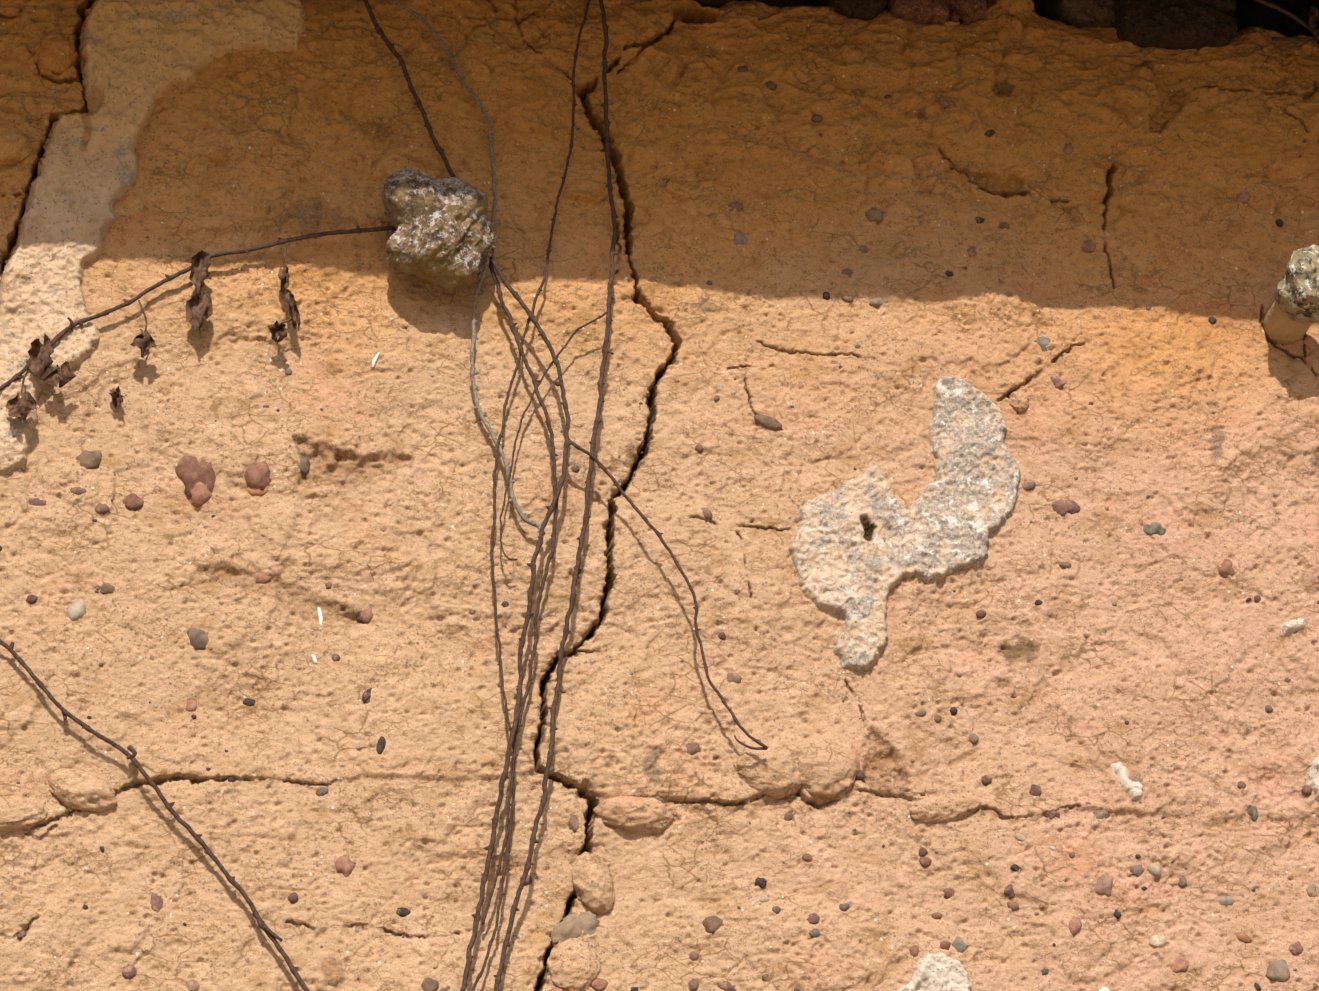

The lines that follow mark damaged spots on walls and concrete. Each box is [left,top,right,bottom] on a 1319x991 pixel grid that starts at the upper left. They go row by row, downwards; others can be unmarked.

crack [0,0,96,282]
flaking render [0,0,306,475]
crack [487,0,682,855]
crack [727,340,875,415]
crack [998,342,1085,414]
flaking render [788,375,1021,673]
crack [114,773,354,795]
crack [661,795,764,806]
crack [796,680,924,809]
flaking render [1306,756,1319,801]
crack [534,887,577,991]
flaking render [897,953,972,991]